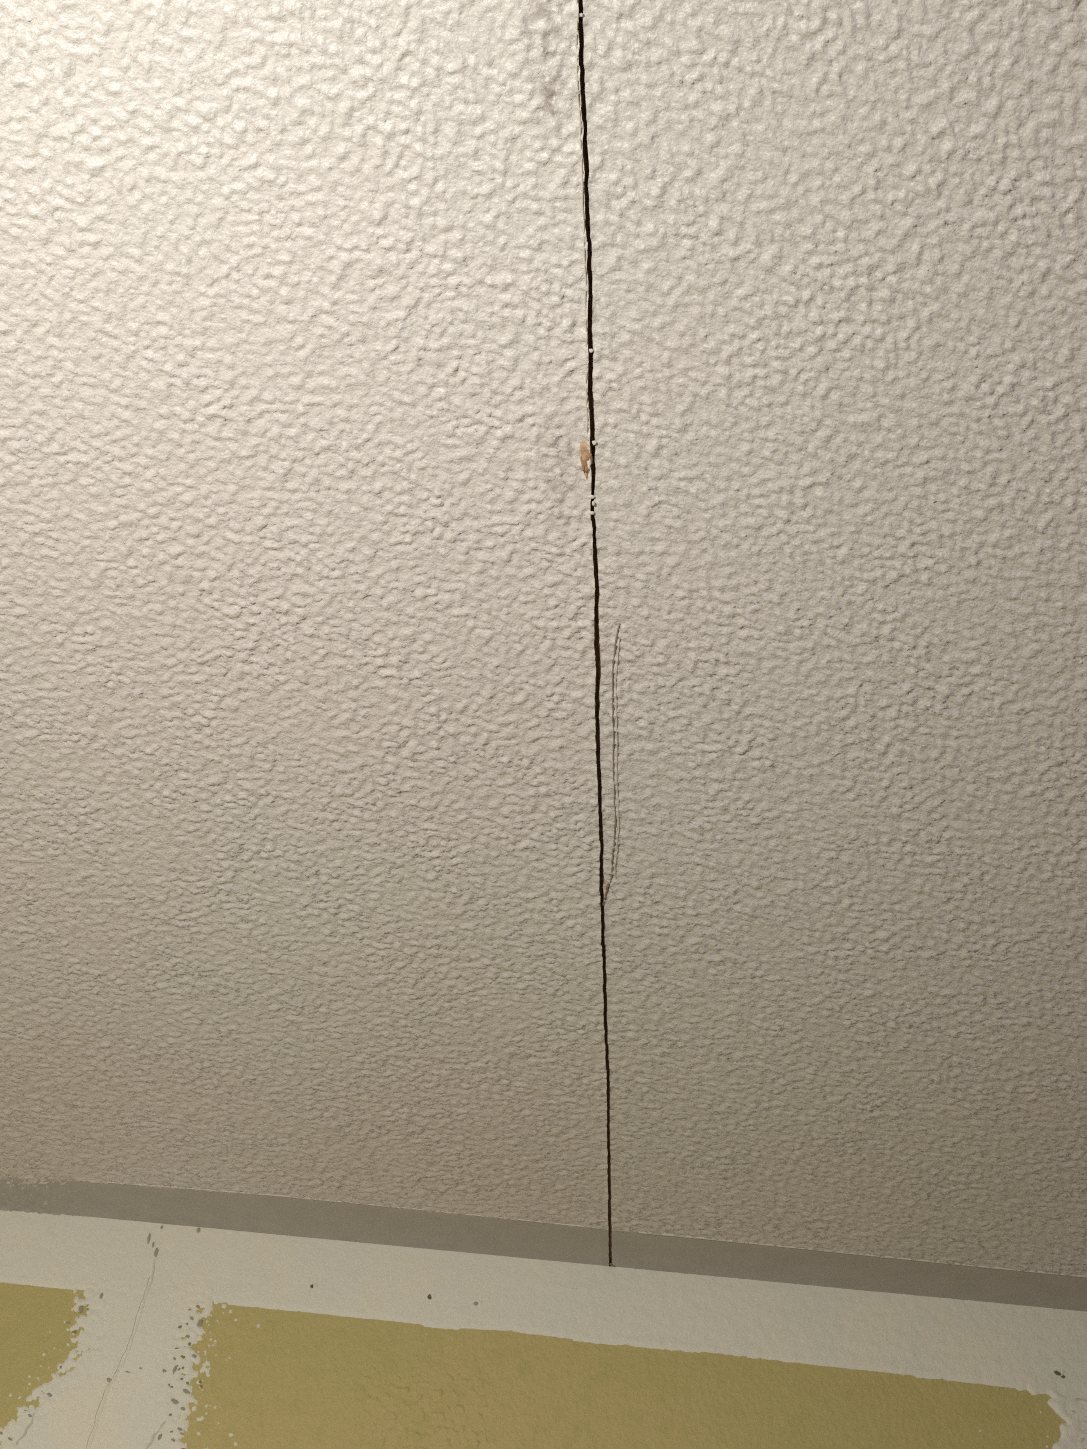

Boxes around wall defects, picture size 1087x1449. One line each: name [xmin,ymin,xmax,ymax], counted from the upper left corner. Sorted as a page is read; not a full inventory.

crack [575,0,621,1267]